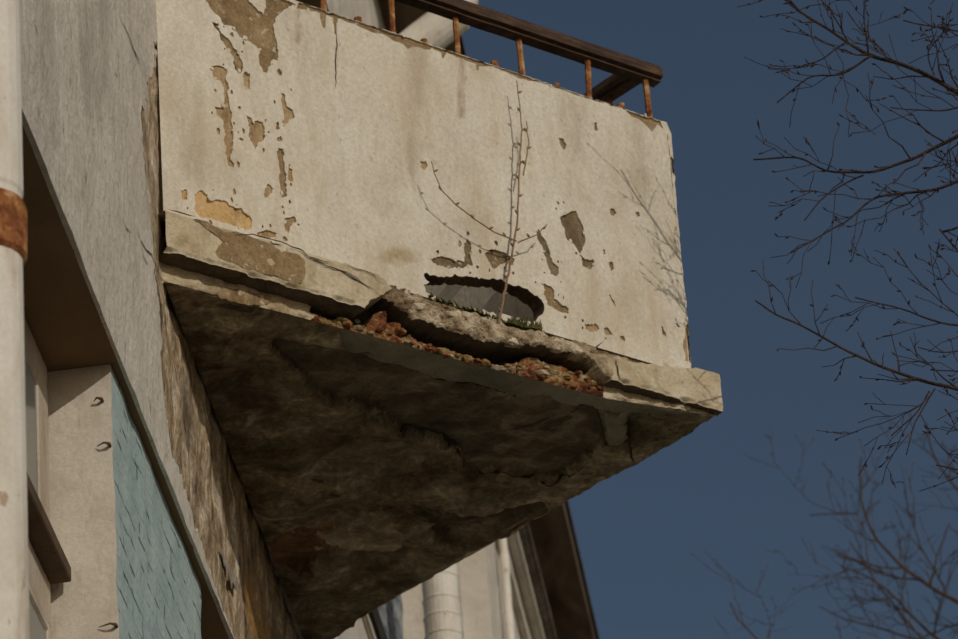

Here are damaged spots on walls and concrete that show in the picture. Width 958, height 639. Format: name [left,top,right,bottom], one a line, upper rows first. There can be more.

spalling [158,0,723,415]
crack [242,234,382,289]
crack [395,423,593,487]
crack [572,404,636,463]